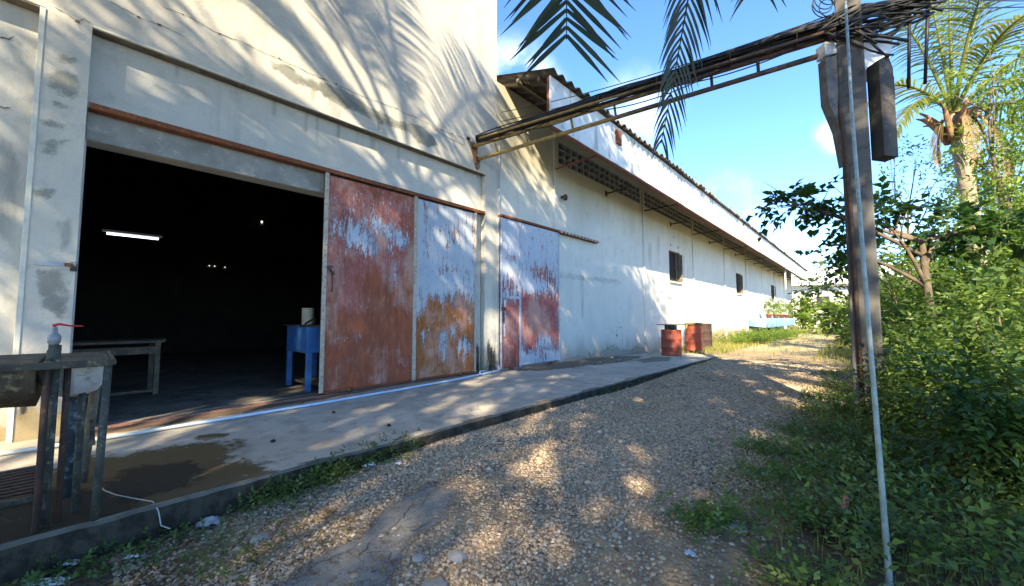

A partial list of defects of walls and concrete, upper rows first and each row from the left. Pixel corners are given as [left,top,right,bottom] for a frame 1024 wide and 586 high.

crack [110,1,465,145]
leakage [0,433,277,544]